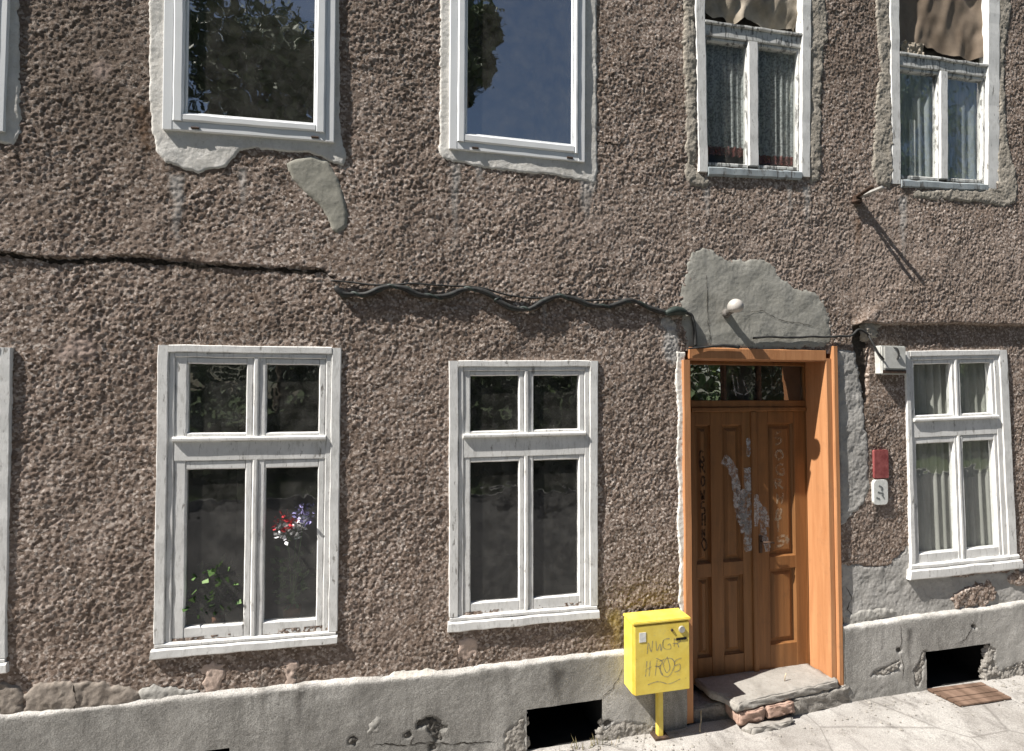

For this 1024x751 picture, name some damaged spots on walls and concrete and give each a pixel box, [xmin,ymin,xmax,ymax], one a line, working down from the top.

crack [0,251,335,280]
flaking render [841,546,1024,624]
spalling [873,647,901,676]
spalling [978,644,1024,681]
spalling [348,714,384,744]
spalling [404,717,445,749]